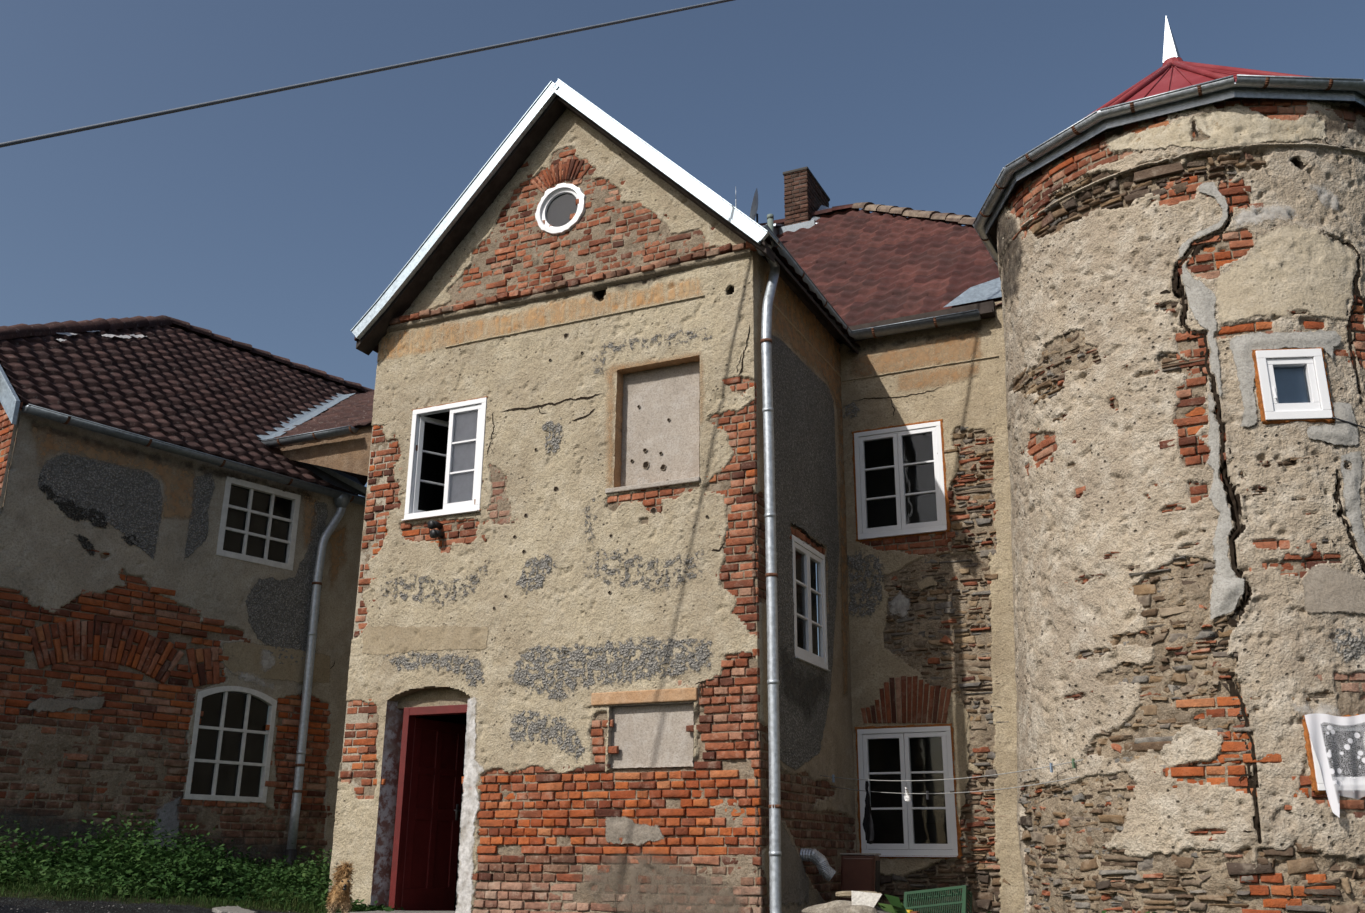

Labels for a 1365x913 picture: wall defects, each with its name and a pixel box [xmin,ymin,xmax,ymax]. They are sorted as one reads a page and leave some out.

flaking render [431,146,719,310]
flaking render [1005,115,1266,279]
crack [487,393,602,454]
flaking render [1010,330,1106,405]
flaking render [1123,298,1273,513]
crack [1160,195,1252,626]
crack [1322,232,1365,408]
flaking render [354,425,528,637]
crack [1333,470,1365,573]
flaking render [0,569,386,870]
flaking render [461,376,857,913]
crack [1226,672,1266,850]